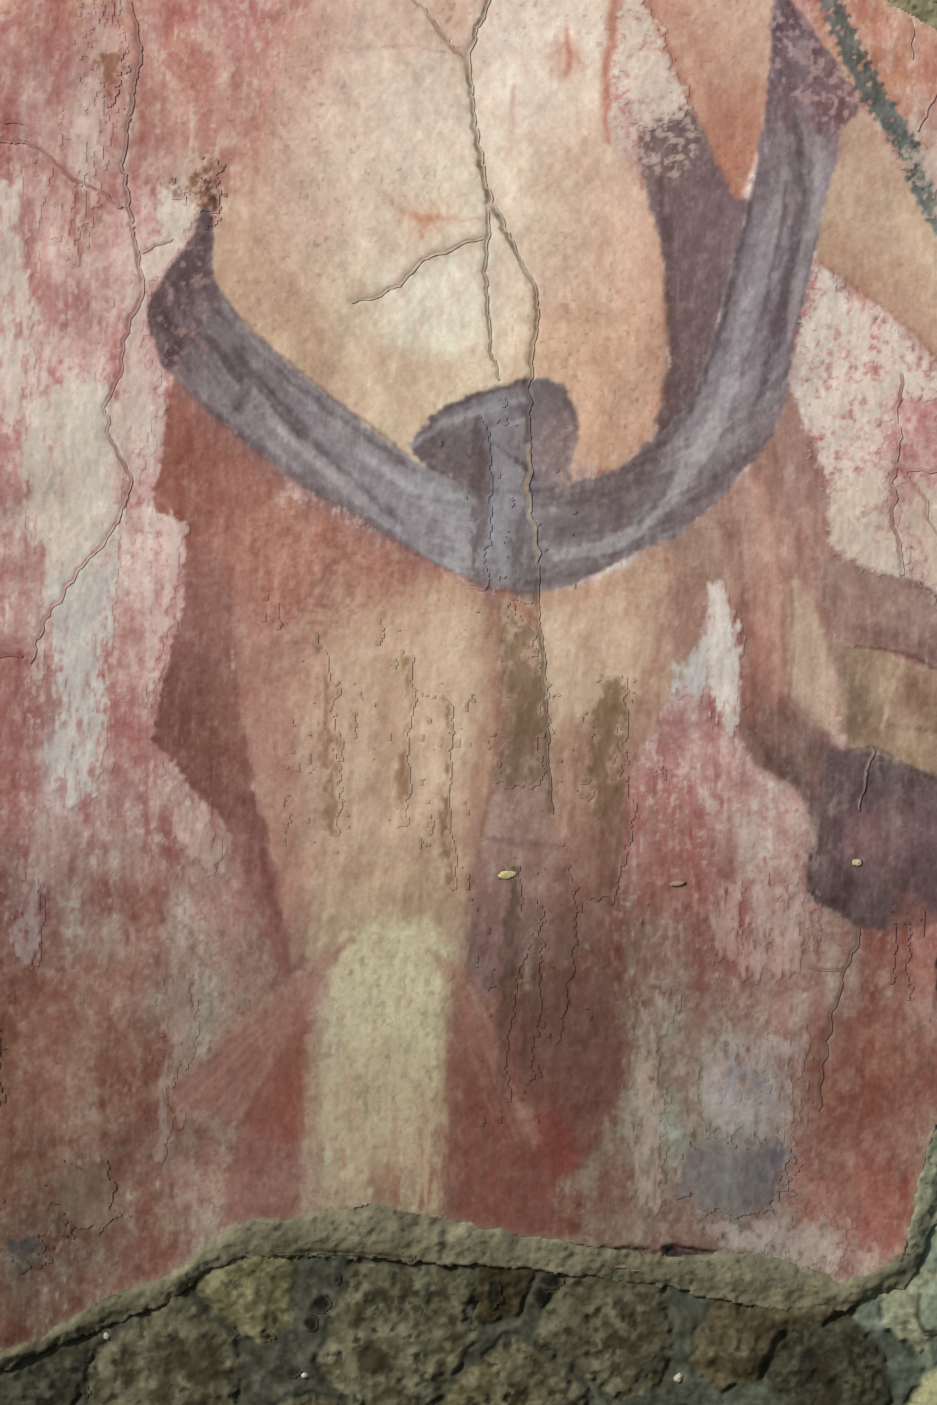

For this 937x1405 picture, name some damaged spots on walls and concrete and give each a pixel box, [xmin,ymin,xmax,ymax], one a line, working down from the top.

crack [0,0,173,664]
crack [350,0,553,814]